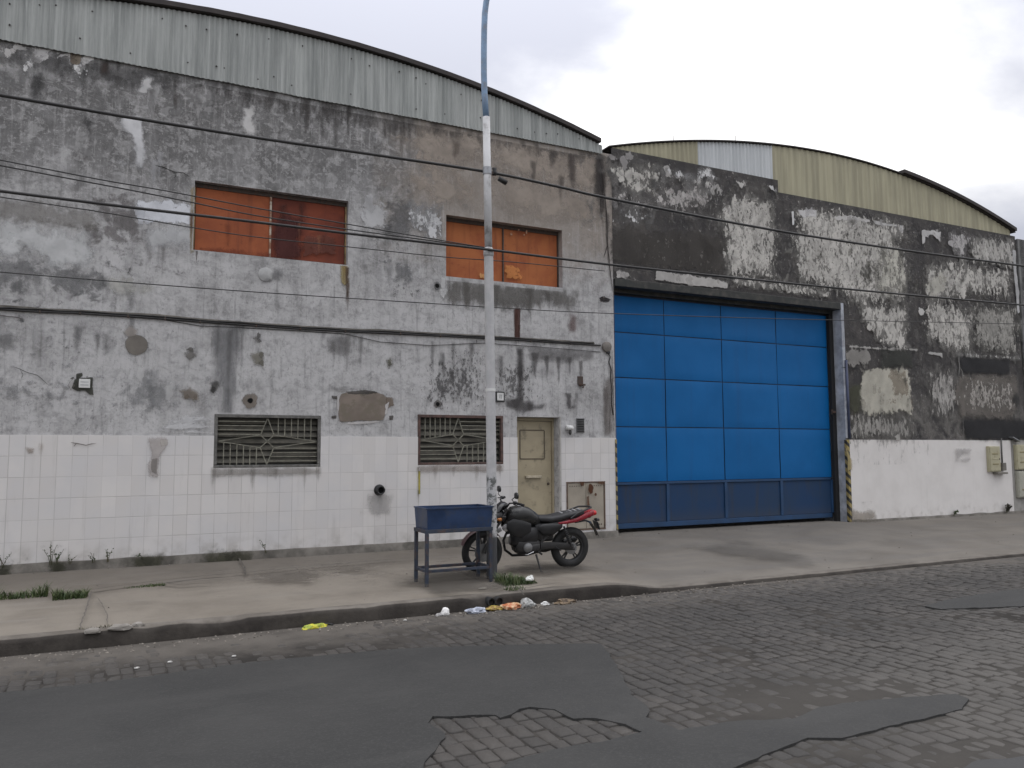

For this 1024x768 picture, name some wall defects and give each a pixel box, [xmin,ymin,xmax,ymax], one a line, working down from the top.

peeling [408,201,442,238]
corrosion [341,266,349,296]
water stain [447,280,575,310]
peeling [496,147,1022,444]
water stain [215,327,238,411]
spalling [332,390,394,424]
water stain [412,340,592,415]
spalling [149,417,206,477]